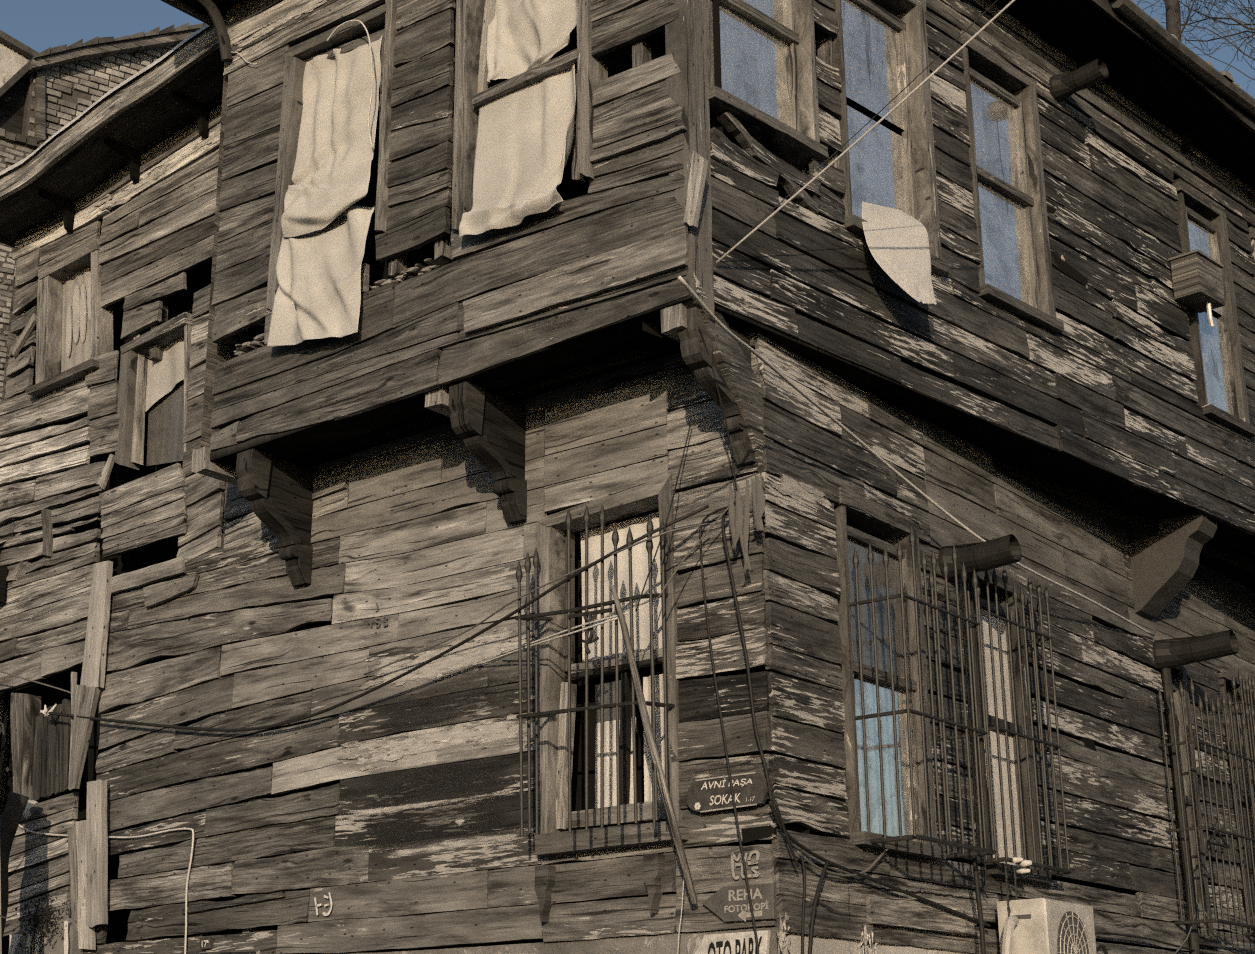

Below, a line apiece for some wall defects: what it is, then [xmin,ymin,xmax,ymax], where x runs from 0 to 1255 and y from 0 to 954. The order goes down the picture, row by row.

peeling [766,474,832,511]
peeling [336,714,535,771]
spalling [741,822,778,844]